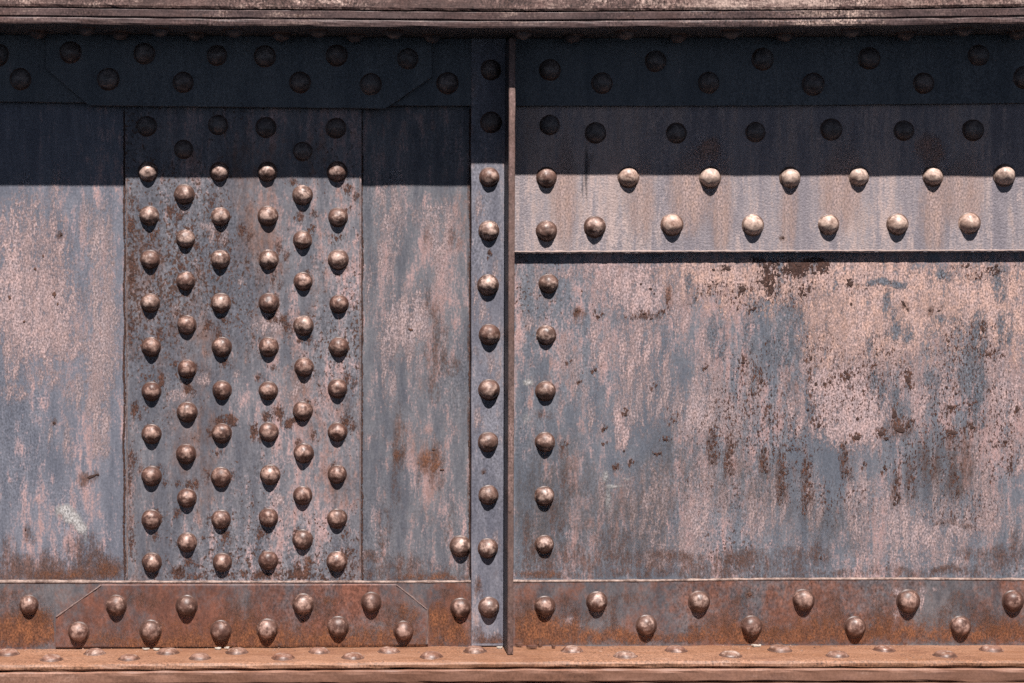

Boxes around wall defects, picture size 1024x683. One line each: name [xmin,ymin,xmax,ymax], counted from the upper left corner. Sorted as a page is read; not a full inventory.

corrosion [803,352,854,428]
corrosion [900,360,915,392]
corrosion [206,413,238,436]
corrosion [250,403,317,446]
corrosion [706,424,736,478]
corrosion [838,402,915,478]
corrosion [940,382,977,444]
corrosion [880,462,936,505]
corrosion [171,557,333,579]
corrosion [0,613,54,647]
corrosion [88,563,500,647]
corrosion [515,600,1024,645]